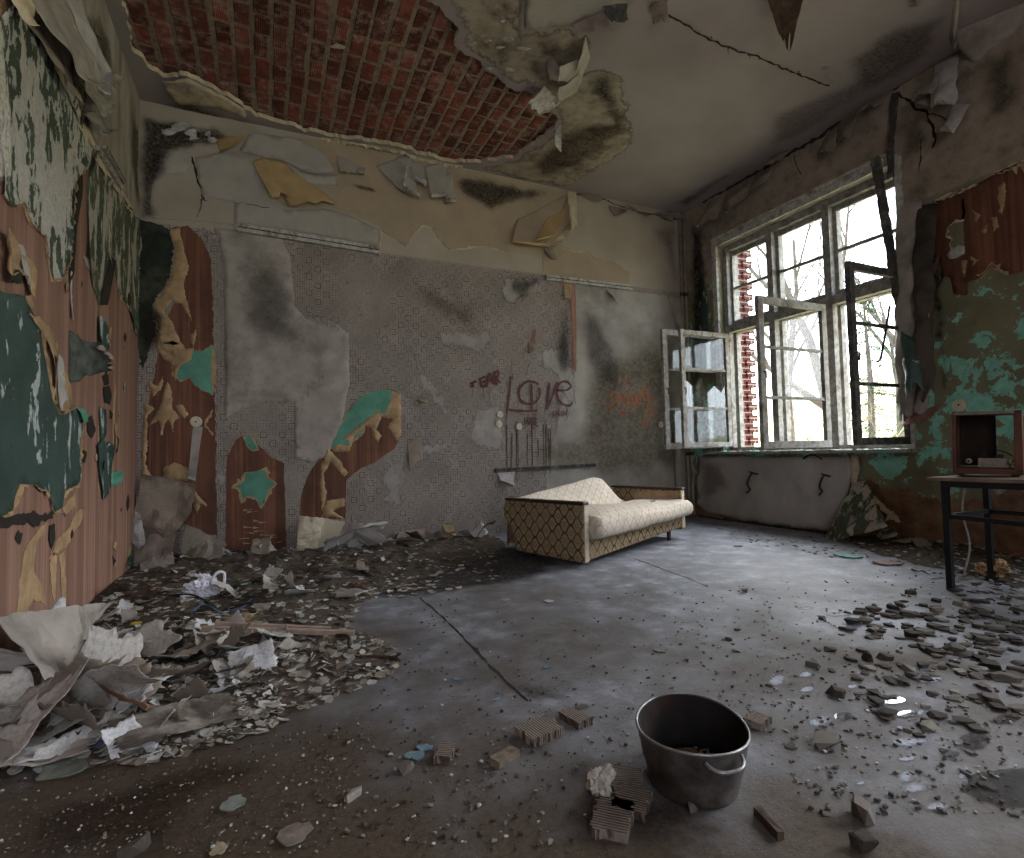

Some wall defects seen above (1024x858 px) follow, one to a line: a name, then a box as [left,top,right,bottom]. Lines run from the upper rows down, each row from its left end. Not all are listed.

crack [668,14,830,86]
peeling [0,4,174,368]
crack [191,156,207,216]
spalling [123,0,683,259]
mould [461,180,537,207]
water stain [536,78,618,174]
crack [702,120,841,204]
crack [892,73,946,167]
peeling [894,200,965,426]
peeling [0,290,84,518]
peeling [188,426,203,482]
crack [420,597,529,701]